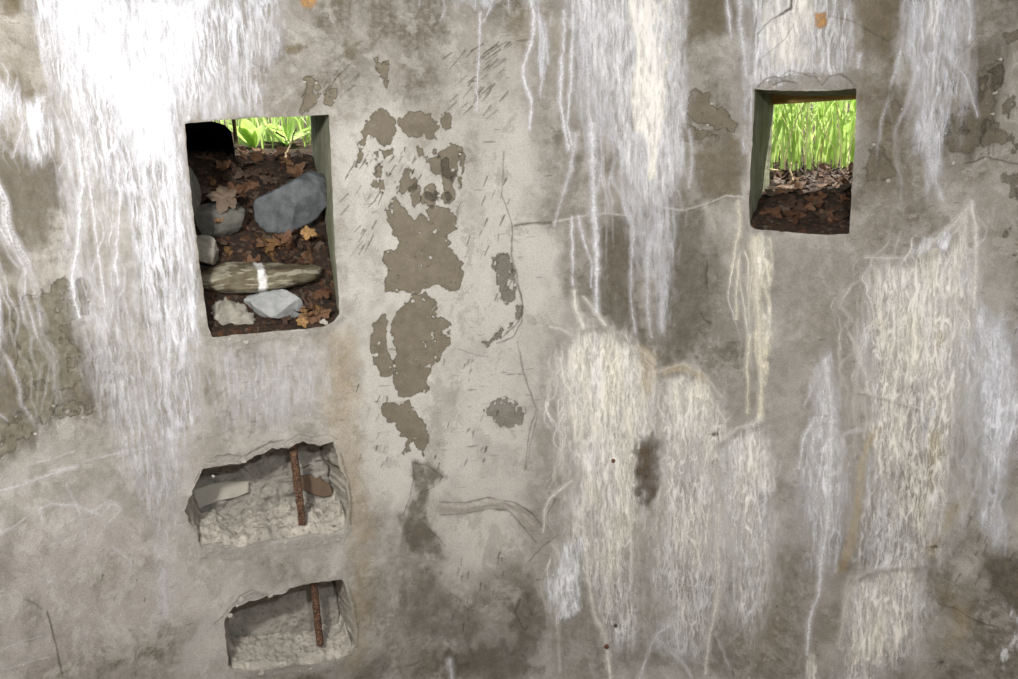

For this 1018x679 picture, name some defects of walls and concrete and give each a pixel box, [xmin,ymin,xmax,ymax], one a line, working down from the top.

peeling [679,89,737,142]
leakage [691,0,851,117]
leakage [895,0,1000,182]
peeling [936,58,1018,165]
leakage [0,0,303,441]
peeling [345,108,466,459]
peeling [483,246,523,347]
leakage [510,0,778,676]
spalling [266,437,307,526]
leakage [798,354,845,679]
leakage [843,201,1018,679]
spalling [310,583,324,646]